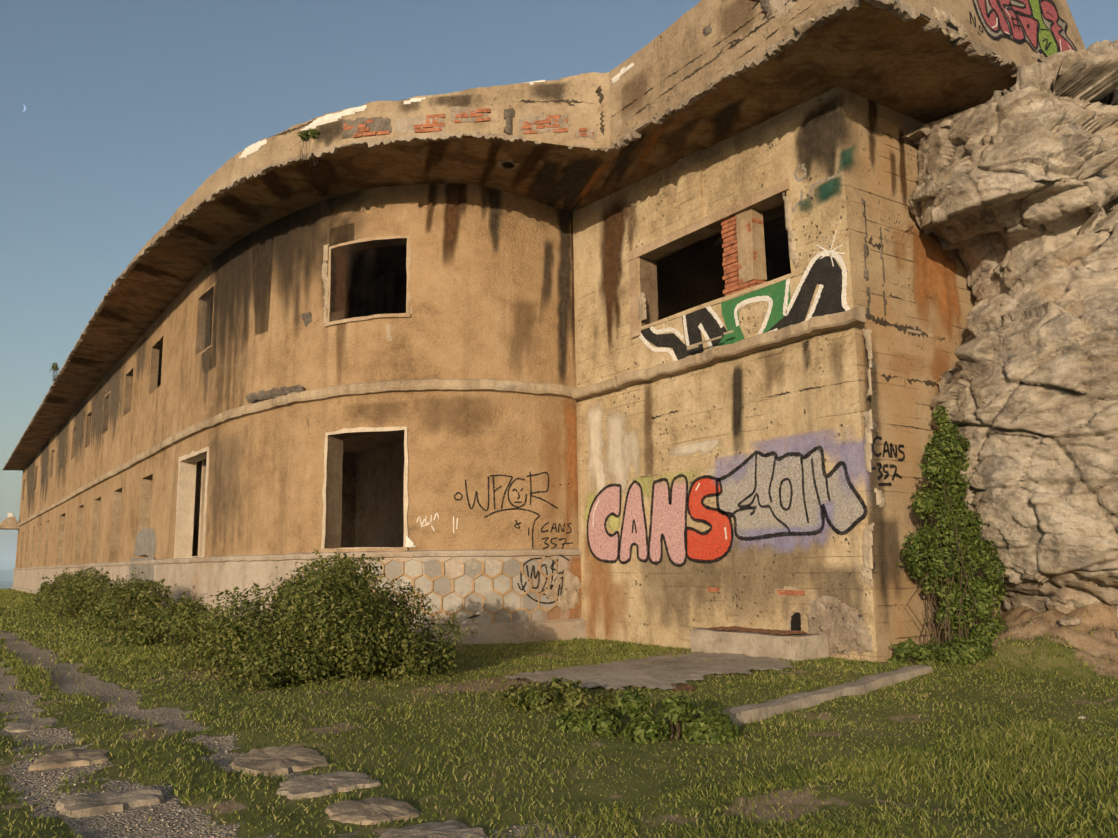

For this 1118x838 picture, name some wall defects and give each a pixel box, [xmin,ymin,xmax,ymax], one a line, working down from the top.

damp [796,96,855,177]
damp [427,183,467,259]
damp [483,188,501,250]
spalling [2,0,1020,472]
damp [529,133,646,378]
rust [914,230,960,328]